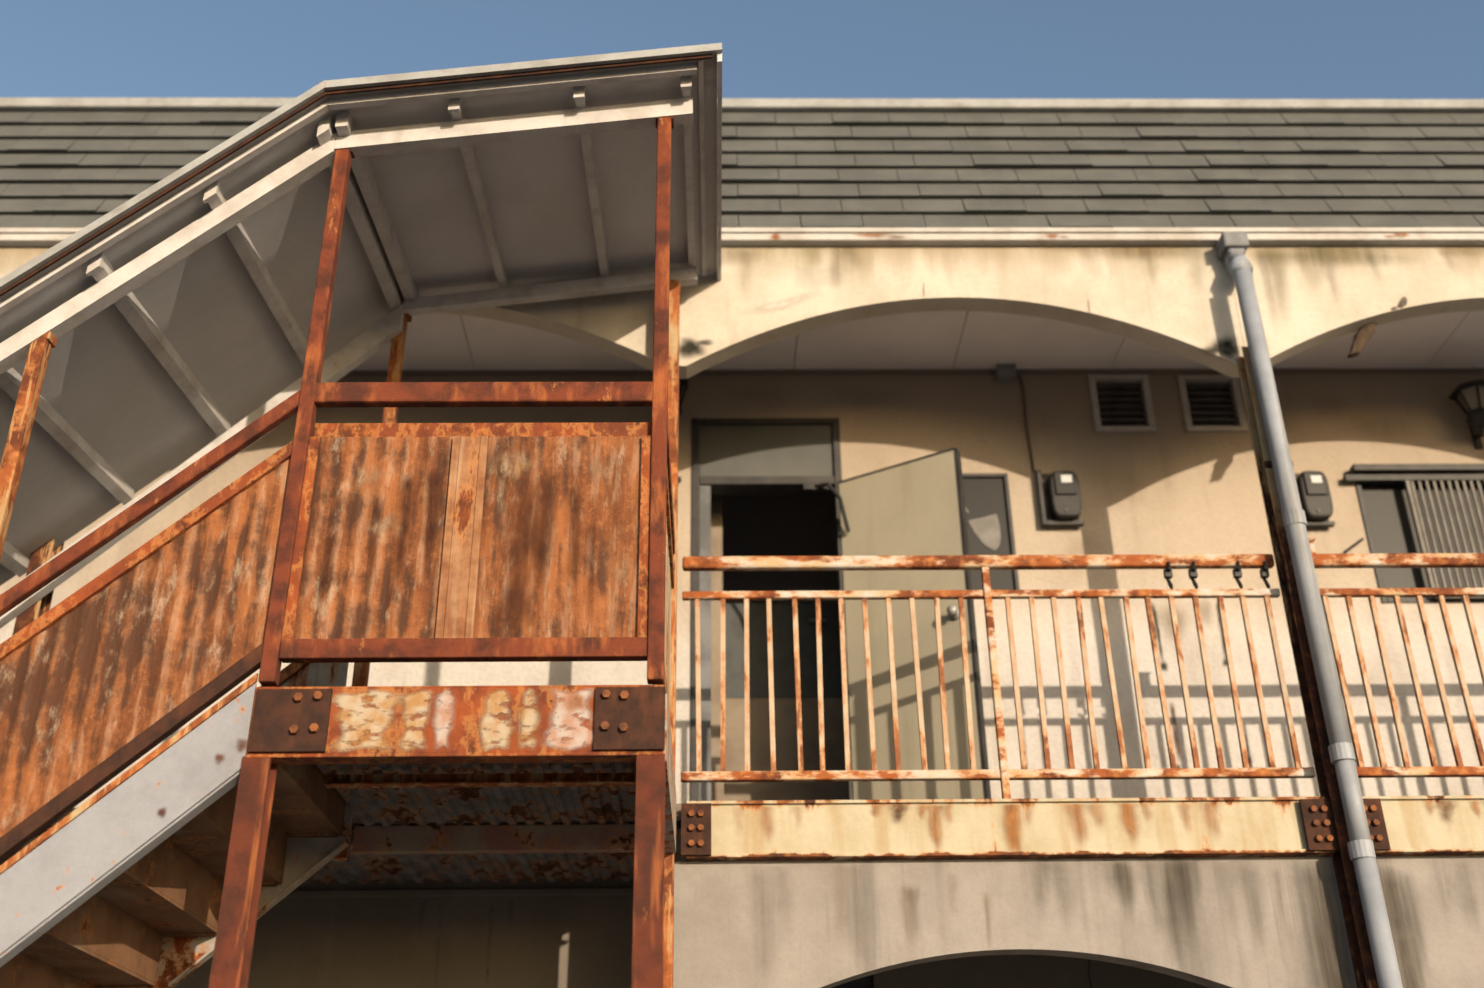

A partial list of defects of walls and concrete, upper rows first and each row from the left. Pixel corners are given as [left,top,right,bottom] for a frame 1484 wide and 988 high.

corrosion [398,472,439,565]
corrosion [514,478,553,564]
corrosion [505,587,523,621]
peeling [334,690,454,751]
peeling [480,690,594,750]
corrosion [1006,805,1018,848]
corrosion [1073,805,1083,834]
corrosion [1123,804,1135,833]
leakage [1116,864,1131,895]
leakage [1166,867,1185,926]
leakage [1318,876,1352,988]
leakage [1386,879,1417,988]